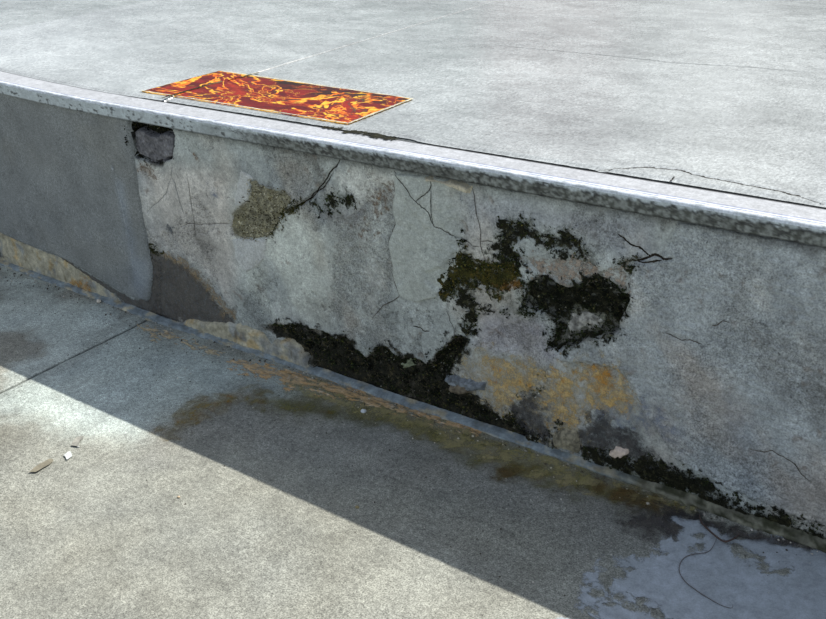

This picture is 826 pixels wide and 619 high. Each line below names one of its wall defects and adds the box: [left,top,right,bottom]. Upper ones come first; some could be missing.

spalling [124,121,175,165]
crack [149,171,227,240]
crack [294,160,340,208]
crack [394,171,492,259]
crack [618,234,672,265]
crack [598,167,819,203]
damp [62,251,235,323]
spalling [499,254,633,359]
spalling [266,318,533,440]
corrosion [461,347,643,448]
damp [137,324,812,551]
spalling [609,446,629,458]